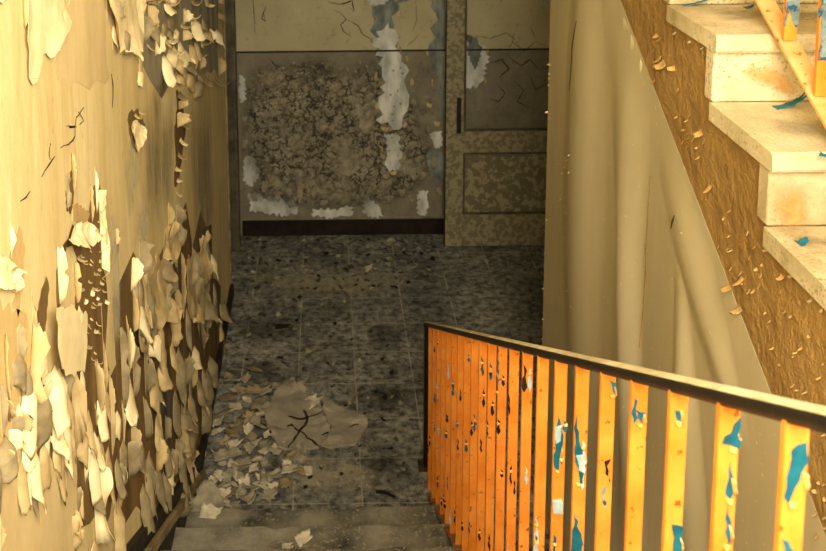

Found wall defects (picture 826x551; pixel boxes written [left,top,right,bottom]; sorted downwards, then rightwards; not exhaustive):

crack [329,0,371,39]
crack [42,107,84,176]
peeling [238,74,247,103]
peeling [242,140,353,219]
peeling [358,0,446,218]
peeling [0,0,233,551]